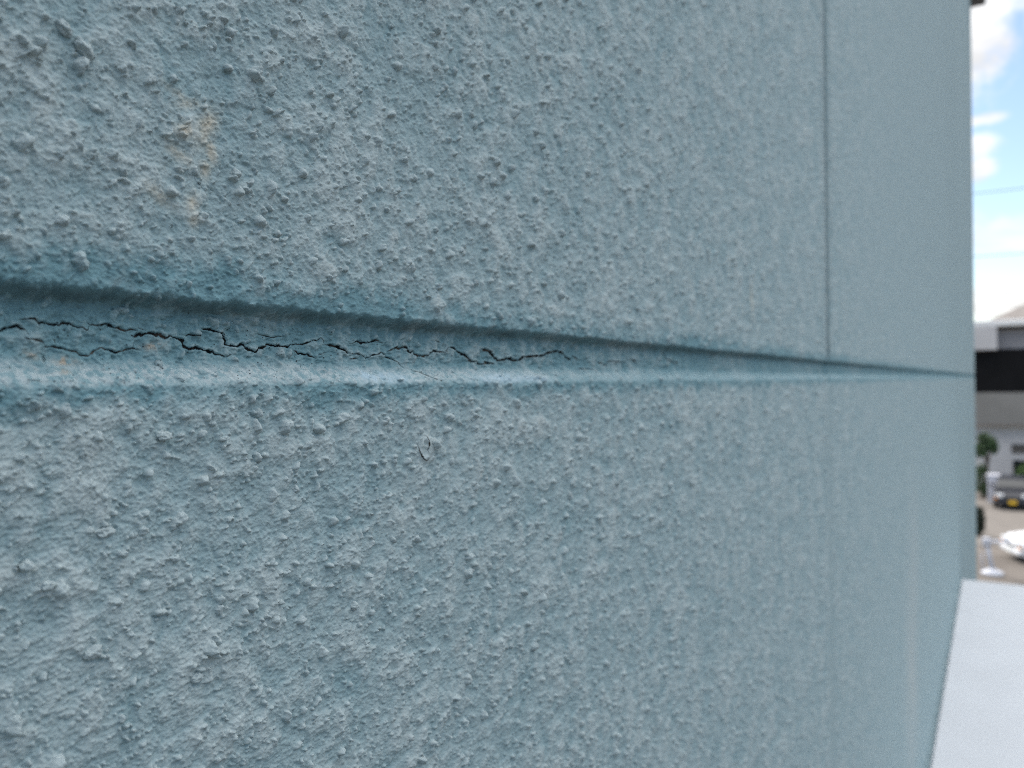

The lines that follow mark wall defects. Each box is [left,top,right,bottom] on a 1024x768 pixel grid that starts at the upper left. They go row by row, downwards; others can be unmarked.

crack [0,317,636,381]